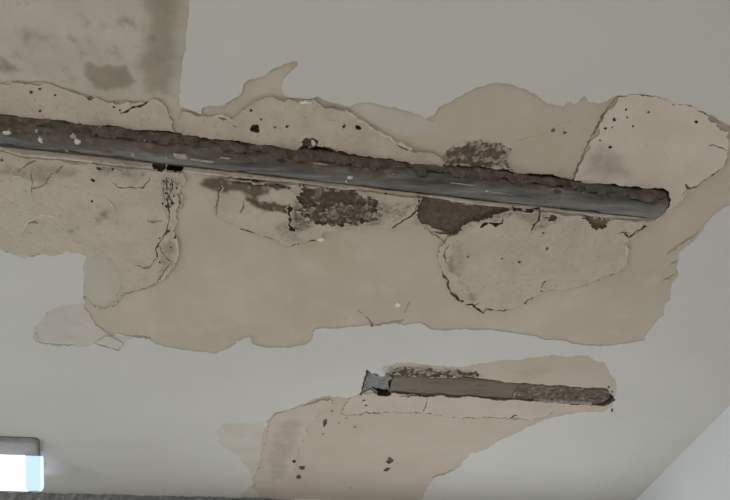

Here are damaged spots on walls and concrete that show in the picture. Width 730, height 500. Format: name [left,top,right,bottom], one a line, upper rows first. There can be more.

crack [114,175,183,295]
rust [0,114,668,203]
peeling [0,0,730,353]
crack [392,200,556,314]
crack [569,96,618,181]
peeling [0,355,617,500]